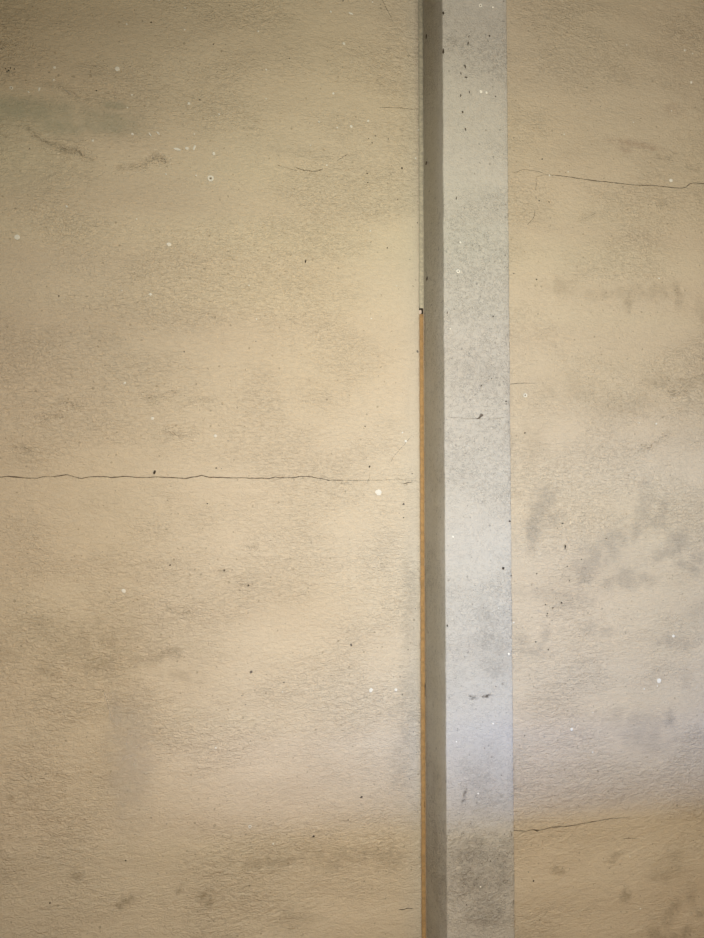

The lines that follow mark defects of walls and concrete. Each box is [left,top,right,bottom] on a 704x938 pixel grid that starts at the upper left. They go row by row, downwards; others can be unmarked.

crack [4,473,369,481]